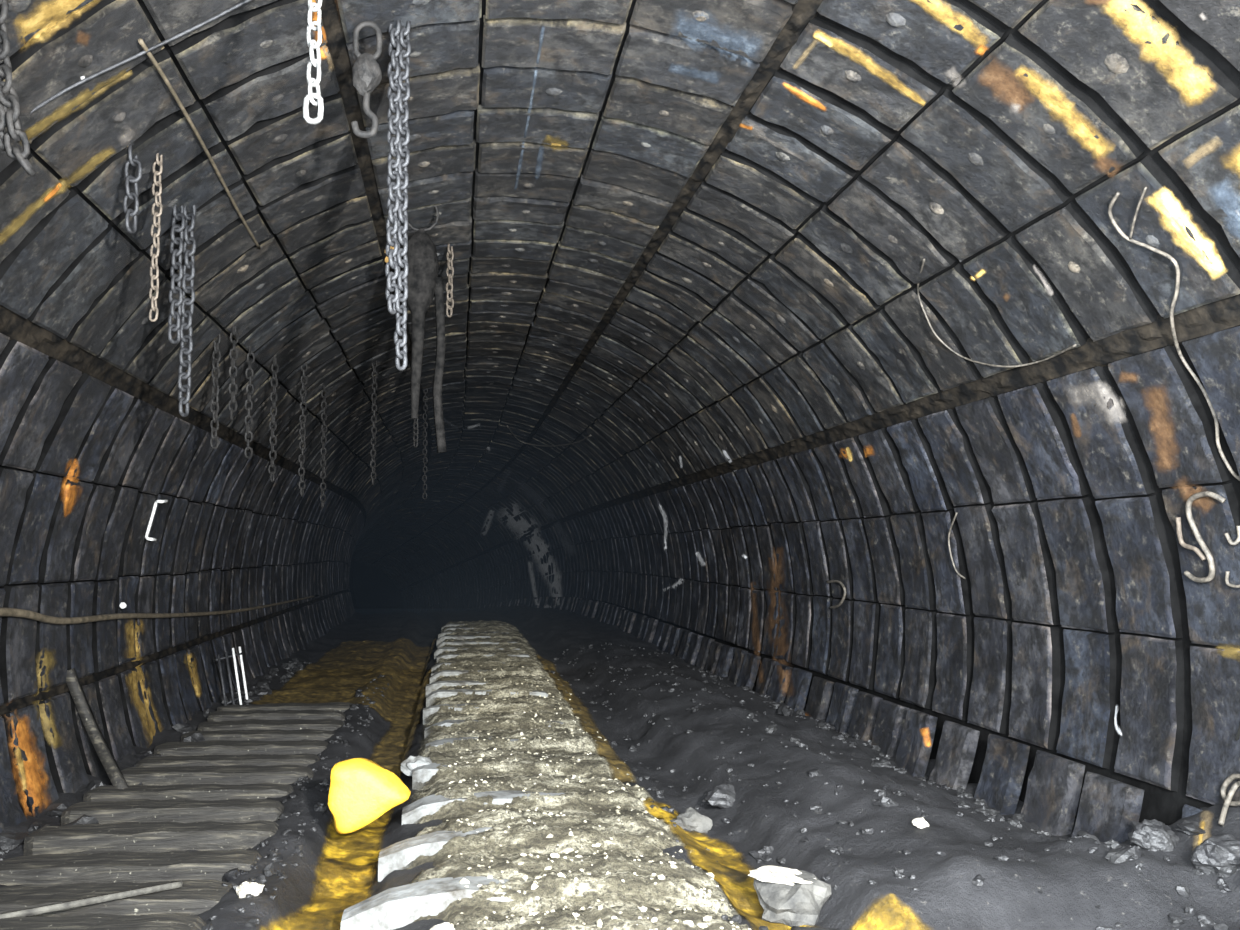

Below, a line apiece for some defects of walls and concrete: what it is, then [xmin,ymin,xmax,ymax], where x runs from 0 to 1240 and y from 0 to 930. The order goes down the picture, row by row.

rust [312,0,335,70]
rust [62,460,78,517]
rust [5,709,47,812]